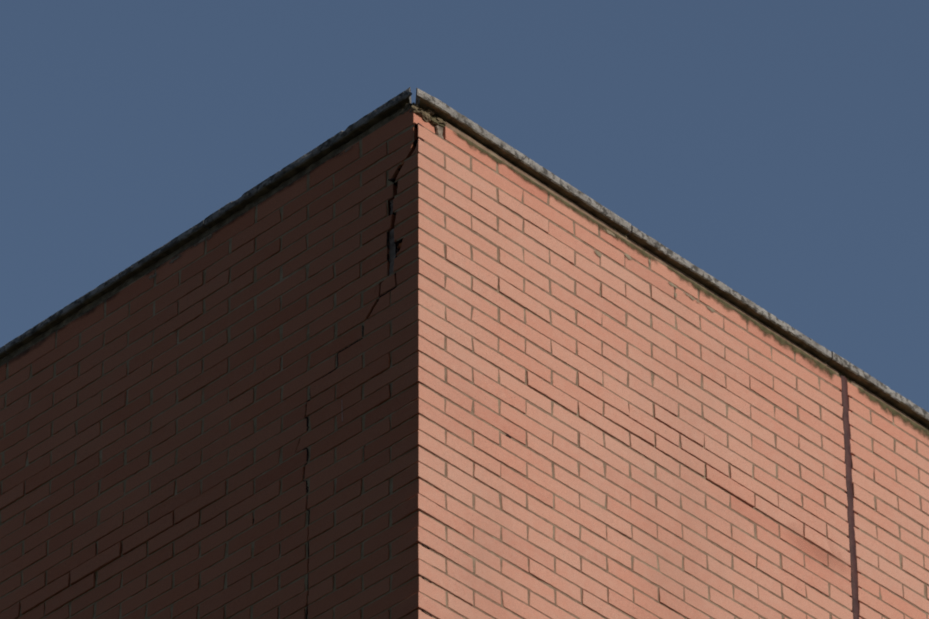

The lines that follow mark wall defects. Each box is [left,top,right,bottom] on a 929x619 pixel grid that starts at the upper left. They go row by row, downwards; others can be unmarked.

crack [302,123,424,619]